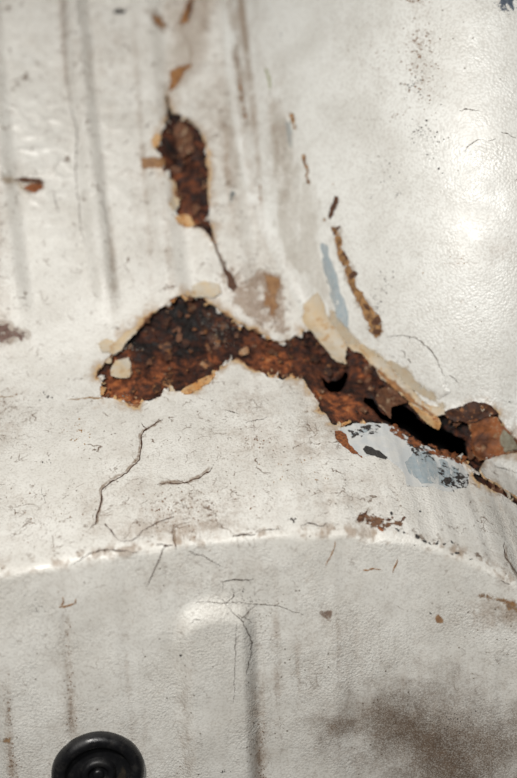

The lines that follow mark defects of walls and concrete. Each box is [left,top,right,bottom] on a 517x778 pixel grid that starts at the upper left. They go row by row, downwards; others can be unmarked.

corrosion [141,64,223,247]
corrosion [320,183,394,338]
corrosion [219,263,289,333]
corrosion [0,324,24,343]
corrosion [375,387,407,419]
corrosion [443,401,517,461]
corrosion [141,426,277,542]
corrosion [357,511,406,532]
crack [74,420,303,699]